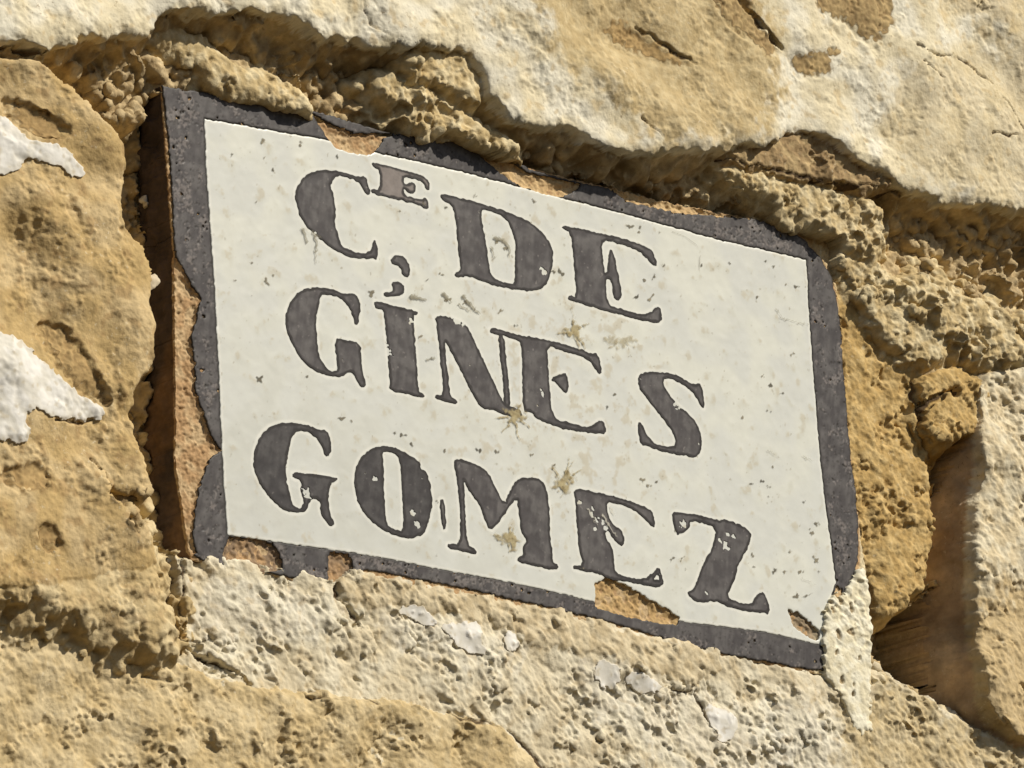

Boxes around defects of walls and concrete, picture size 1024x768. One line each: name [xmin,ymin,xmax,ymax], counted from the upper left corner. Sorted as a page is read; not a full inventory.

crack [638,30,687,59]
crack [745,11,777,47]
peeling [318,122,386,158]
peeling [328,551,352,581]
peeling [594,577,679,625]
peeling [788,610,820,640]